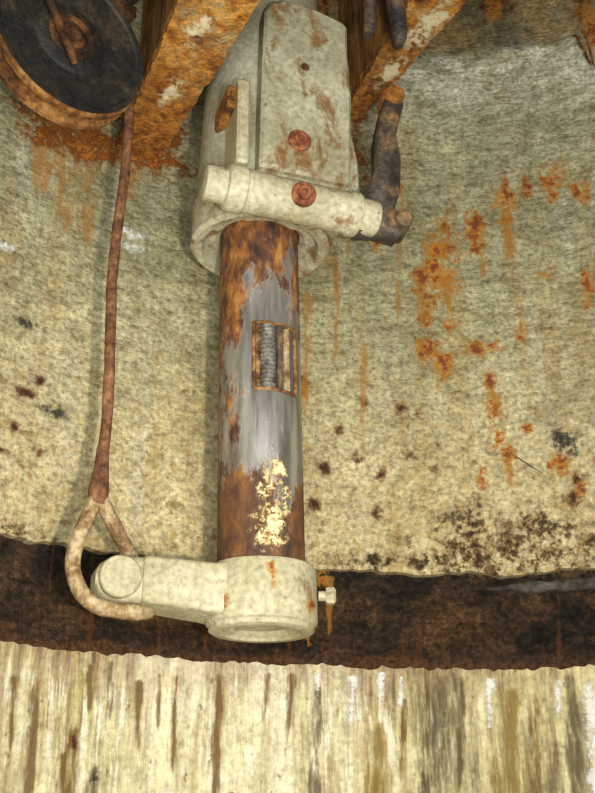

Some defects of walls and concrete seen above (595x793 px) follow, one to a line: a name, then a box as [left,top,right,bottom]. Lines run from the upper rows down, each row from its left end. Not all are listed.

corrosion [10,97,198,177]
corrosion [410,217,463,328]
corrosion [463,211,486,255]
corrosion [491,166,590,233]
corrosion [483,369,516,475]
corrosion [547,454,587,505]
leakage [9,676,17,750]
leakage [24,678,39,793]
leakage [60,727,77,793]
leakage [212,675,223,793]
leakage [422,675,466,793]
leakage [555,675,595,793]